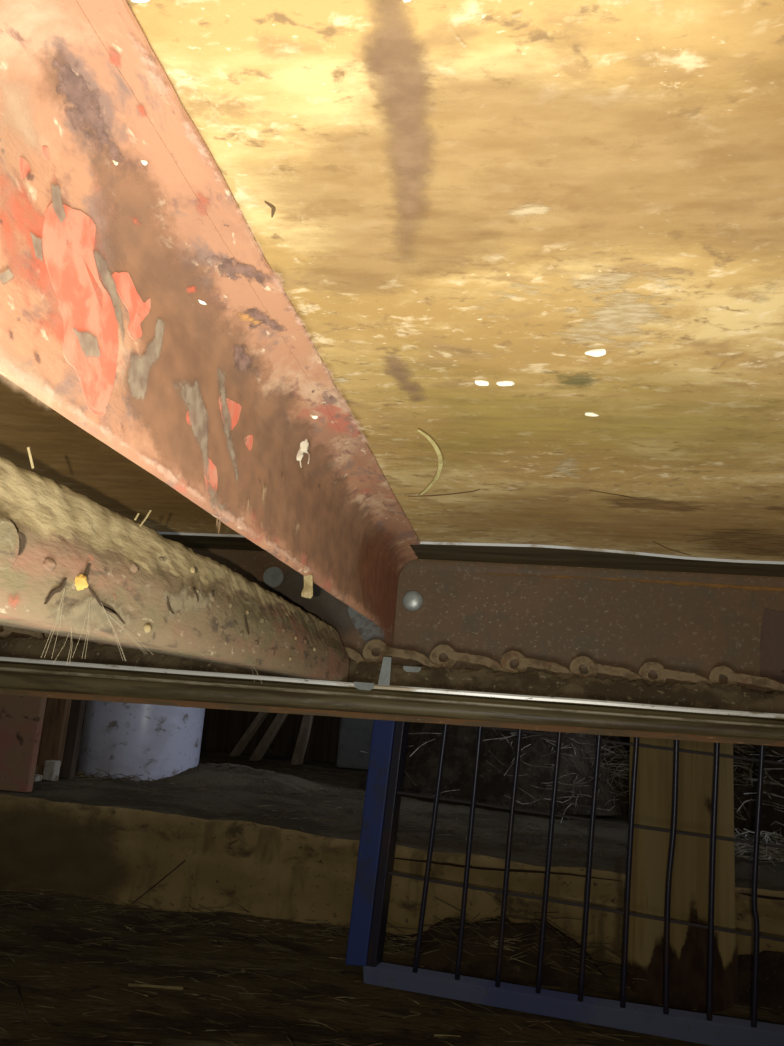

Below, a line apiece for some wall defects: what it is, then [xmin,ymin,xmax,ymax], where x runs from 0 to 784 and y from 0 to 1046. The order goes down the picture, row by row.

water stain [284,0,784,277]
rust [51,185,66,223]
rust [30,233,43,262]
peeling [0,157,151,416]
peeling [206,256,274,284]
rust [73,329,101,358]
peeling [219,396,242,430]
rust [95,157,401,638]
peeling [204,458,218,496]